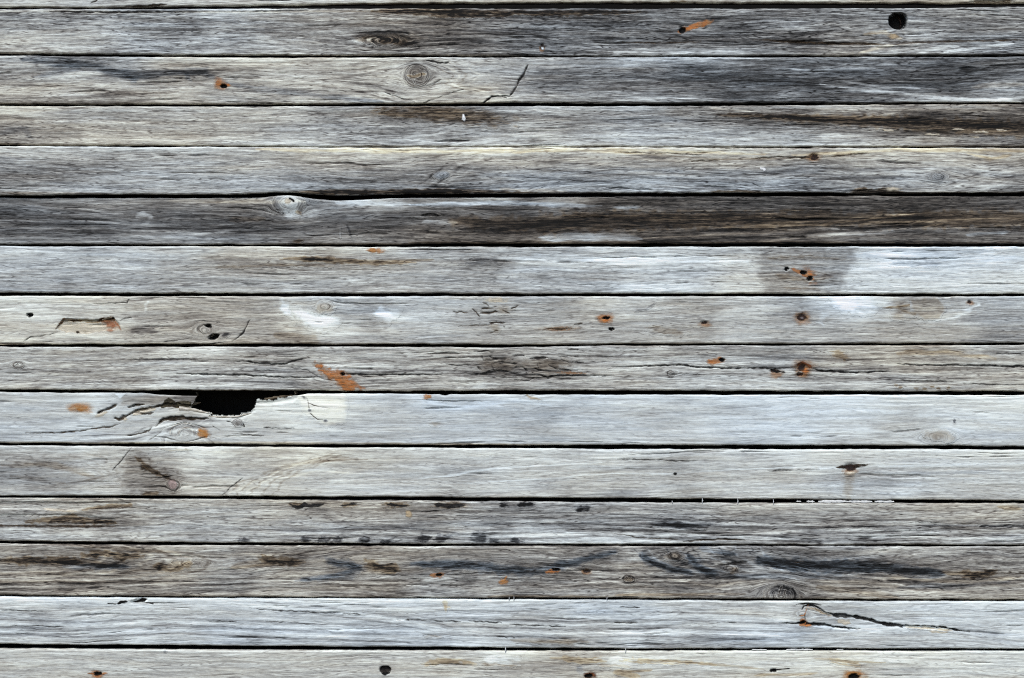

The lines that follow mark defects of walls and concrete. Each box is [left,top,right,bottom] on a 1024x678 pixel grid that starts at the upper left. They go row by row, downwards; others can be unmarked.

rust [678,20,712,33]
crack [385,60,528,103]
rust [784,267,815,283]
rust [315,364,364,391]
crack [42,297,784,468]
rust [68,404,89,412]
spalling [179,392,251,418]
crack [778,585,970,633]